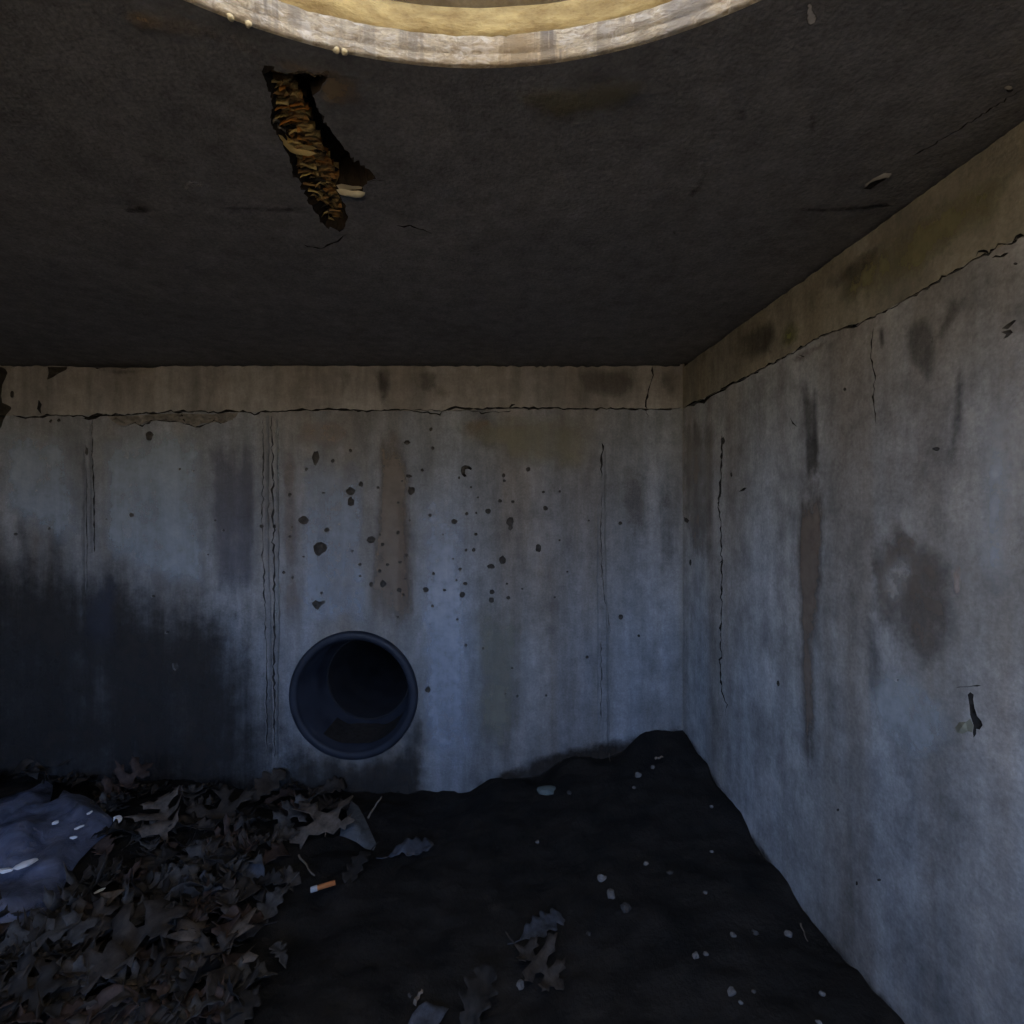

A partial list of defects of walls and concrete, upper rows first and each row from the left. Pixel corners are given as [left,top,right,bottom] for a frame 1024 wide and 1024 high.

spalling [262,65,376,232]
crack [14,233,1024,756]
water stain [806,400,817,469]
water stain [0,558,268,791]
water stain [799,493,822,751]
spalling [955,692,982,737]